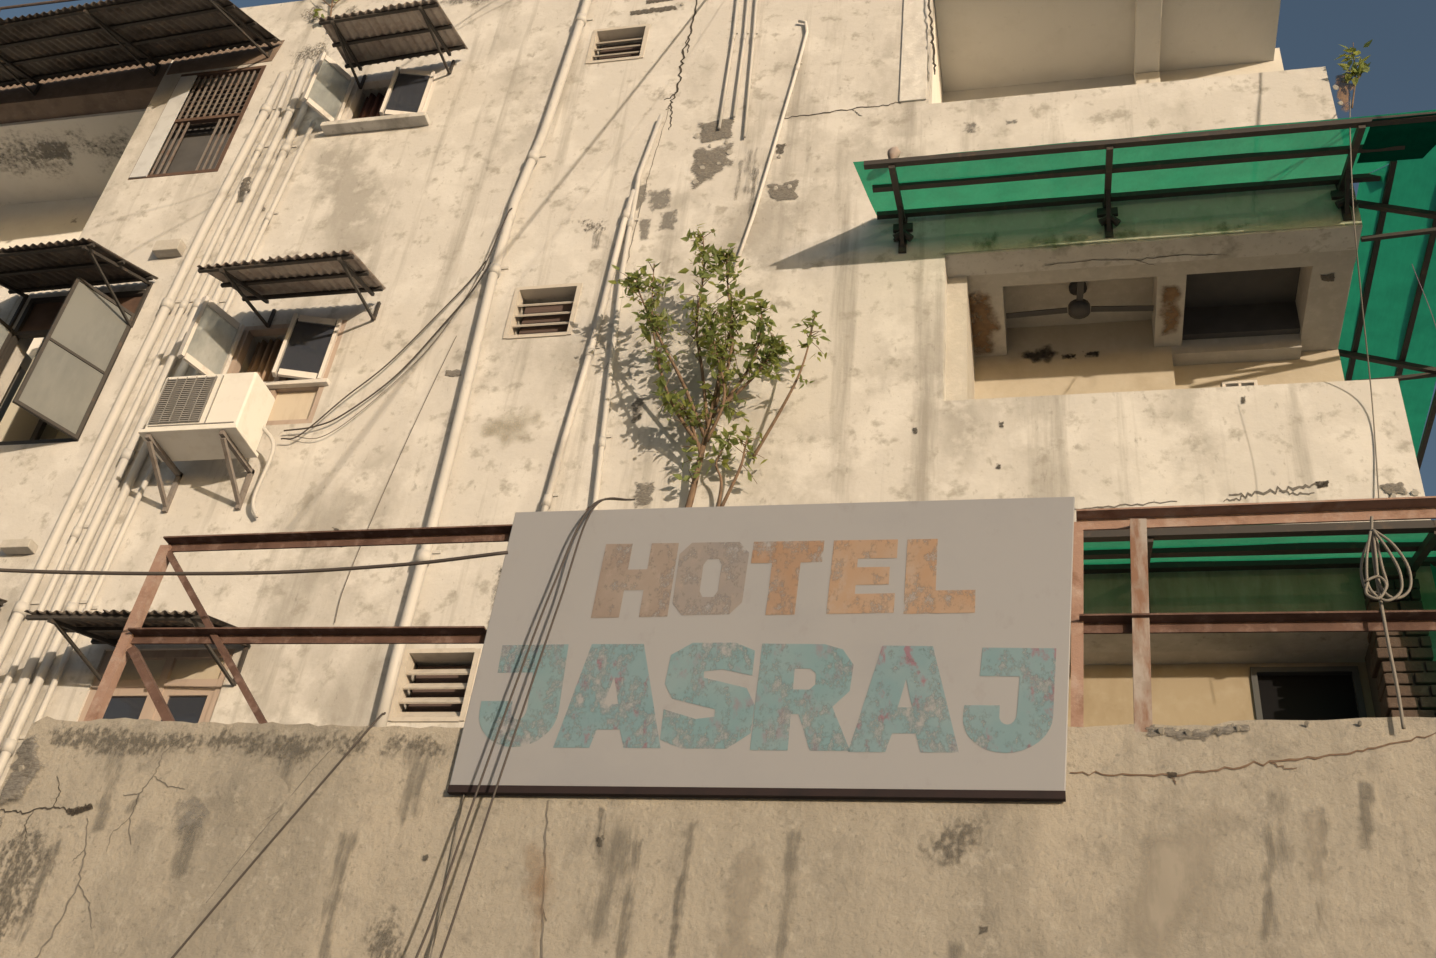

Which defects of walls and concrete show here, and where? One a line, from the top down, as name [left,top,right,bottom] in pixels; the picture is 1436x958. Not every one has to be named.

spalling [692,118,734,189]
damp [50,728,441,760]
crack [1070,732,1436,784]
crack [0,735,192,958]
damp [935,820,978,864]
mould [0,830,48,935]
damp [1136,840,1203,940]